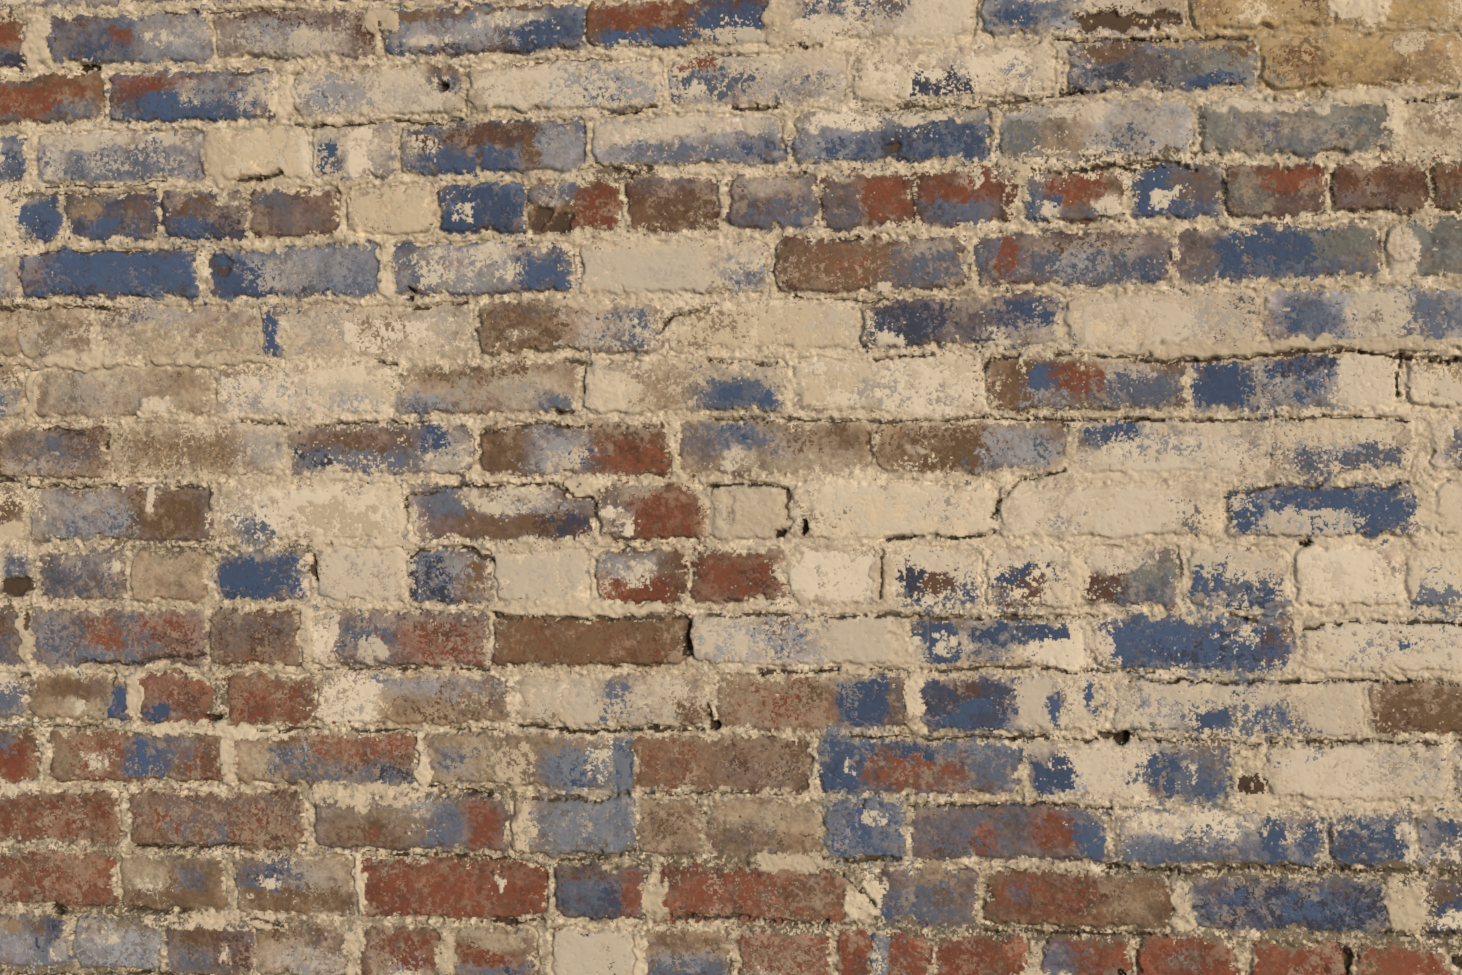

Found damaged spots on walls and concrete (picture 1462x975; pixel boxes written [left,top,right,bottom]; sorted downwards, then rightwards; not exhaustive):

flaking render [985,100,1135,285]
flaking render [764,346,1114,476]
flaking render [0,132,1013,975]
flaking render [996,555,1062,621]
flaking render [1085,562,1130,604]
flaking render [1254,609,1293,676]
flaking render [626,668,1462,975]